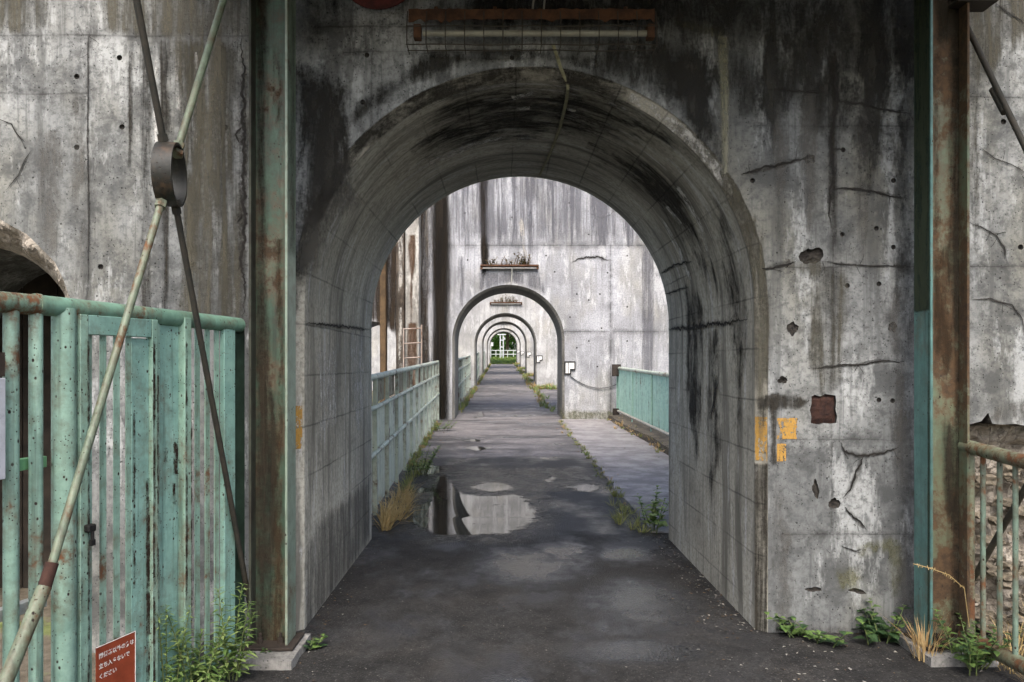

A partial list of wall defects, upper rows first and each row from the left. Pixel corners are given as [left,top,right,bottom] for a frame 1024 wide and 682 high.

crack [235,39,249,316]
rust [256,0,283,641]
water stain [296,0,914,633]
spalling [786,321,799,336]
spalling [798,248,824,264]
rust [810,394,835,424]
crack [741,53,914,221]
crack [808,359,903,372]
crack [841,443,899,552]
rust [934,0,959,638]
spalling [970,414,1024,454]
spalling [975,456,1024,632]